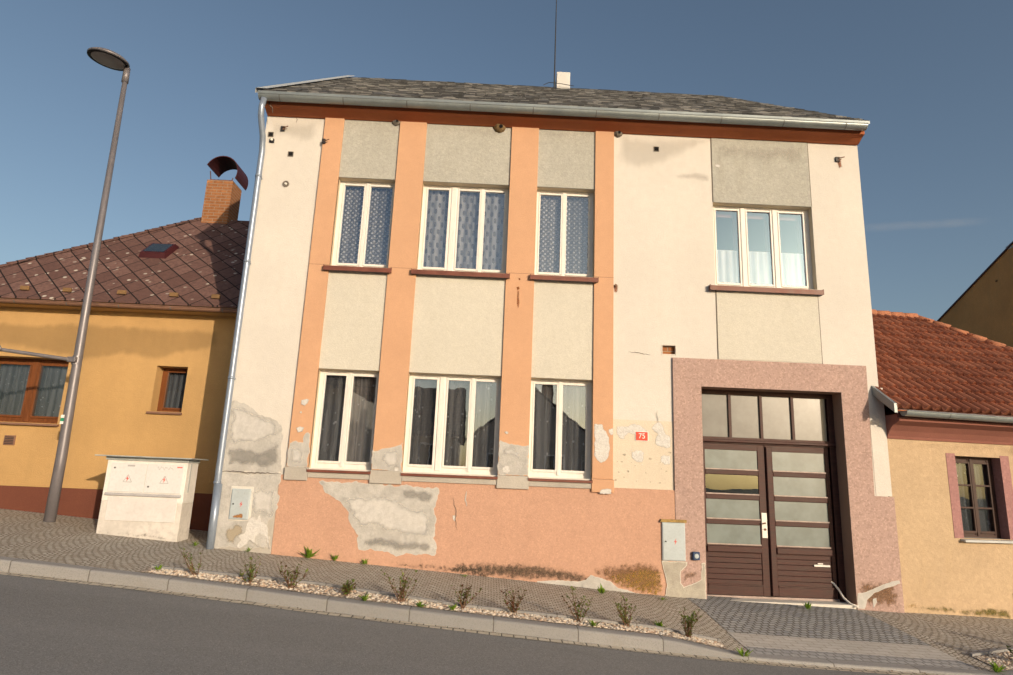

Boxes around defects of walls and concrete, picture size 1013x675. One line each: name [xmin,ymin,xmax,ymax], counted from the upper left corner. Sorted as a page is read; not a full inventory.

flaking render [214,400,310,549]
peeling [371,444,403,471]
peeling [497,431,529,476]
peeling [594,422,671,494]
flaking render [319,480,439,557]